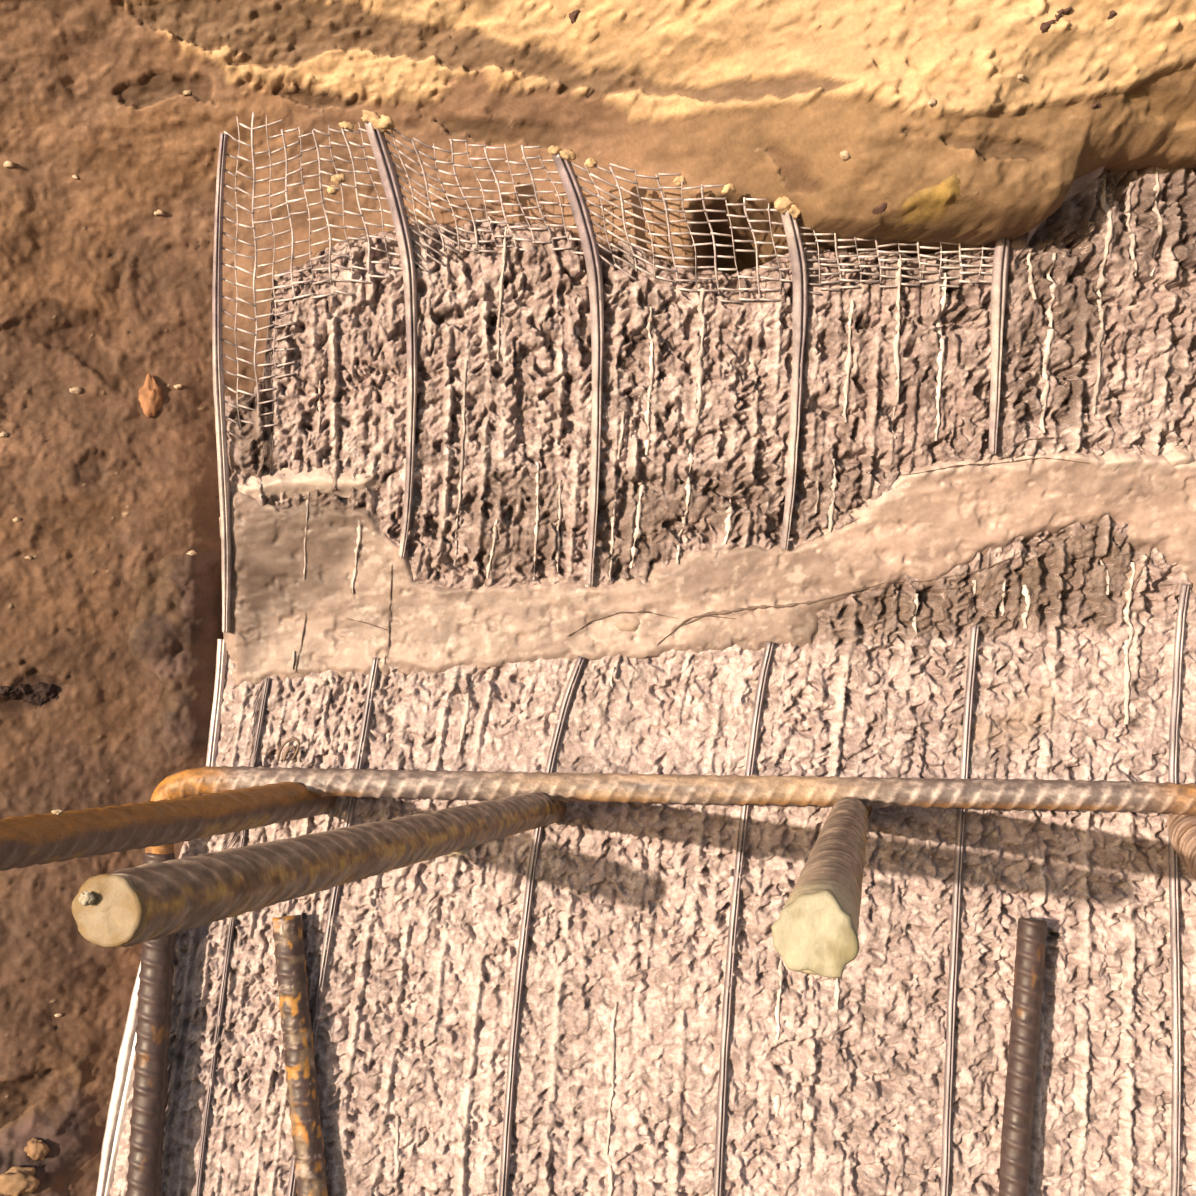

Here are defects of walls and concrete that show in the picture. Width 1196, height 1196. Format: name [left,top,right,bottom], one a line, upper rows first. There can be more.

leakage [644,306,654,455]
leakage [676,288,706,564]
leakage [842,300,855,422]
leakage [889,259,903,439]
leakage [934,273,948,441]
leakage [1013,167,1196,433]
leakage [486,519,498,578]
leakage [532,463,540,580]
leakage [608,503,617,580]
leakage [630,485,646,568]
leakage [723,499,735,544]
leakage [814,459,838,532]